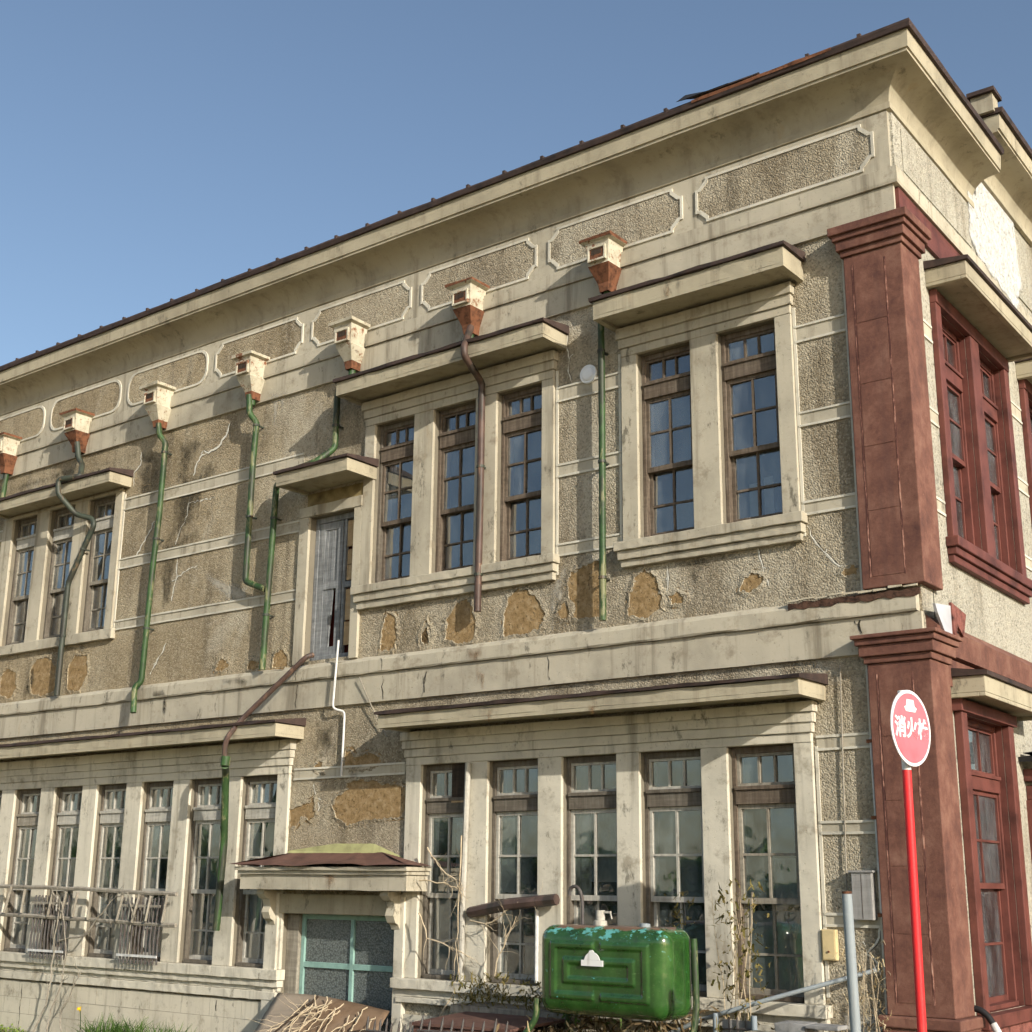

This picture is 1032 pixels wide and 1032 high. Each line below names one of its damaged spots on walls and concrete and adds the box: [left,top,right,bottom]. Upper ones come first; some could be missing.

crack [136,521,155,555]
crack [171,423,231,601]
flaking render [377,607,402,656]
flaking render [415,594,481,651]
flaking render [498,554,609,640]
flaking render [624,565,691,623]
flaking render [736,569,770,599]
flaking render [0,650,91,703]
flaking render [289,746,406,833]